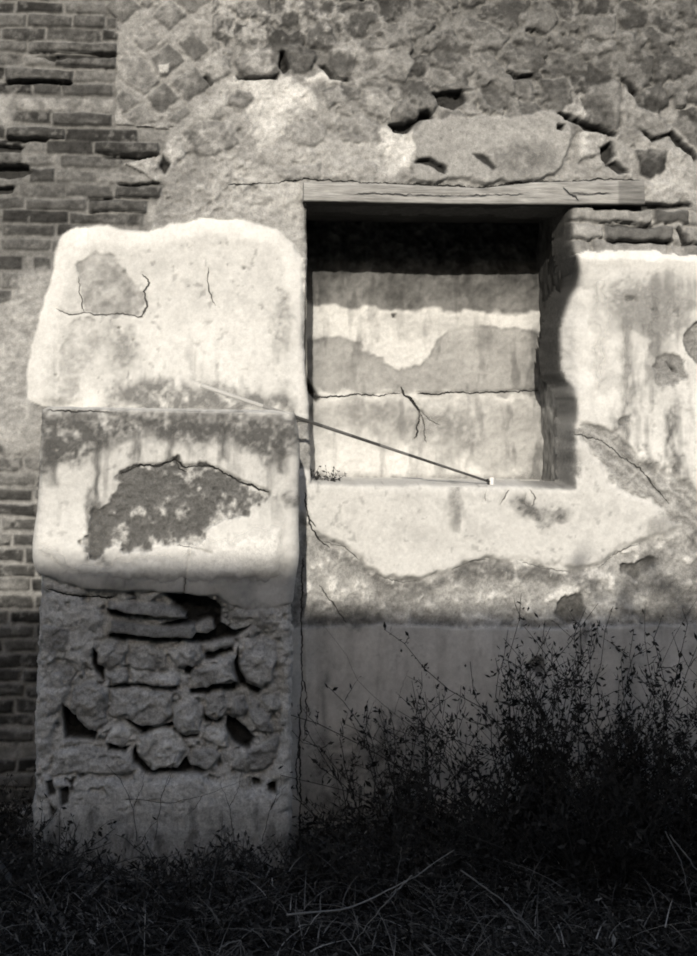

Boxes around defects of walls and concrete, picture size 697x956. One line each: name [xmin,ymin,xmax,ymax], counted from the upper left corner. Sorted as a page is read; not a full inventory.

peeling [52,251,146,407]
crack [317,387,539,441]
spalling [652,323,697,388]
spalling [39,414,697,801]